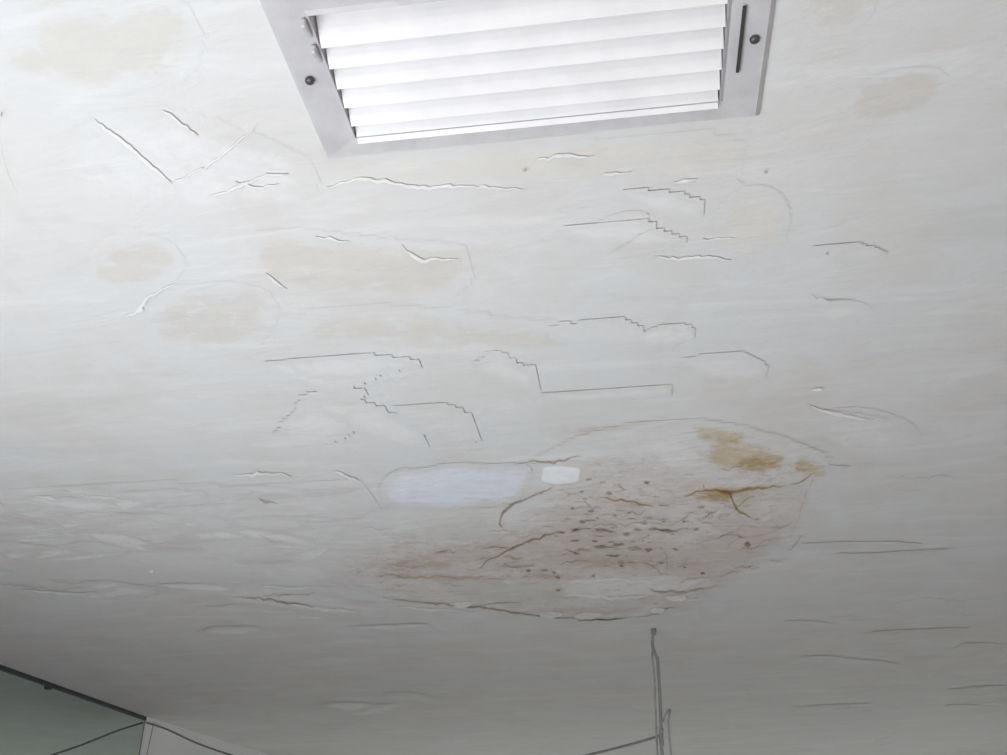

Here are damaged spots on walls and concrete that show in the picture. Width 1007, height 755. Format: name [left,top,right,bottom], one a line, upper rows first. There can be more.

flaking render [312,418,836,626]